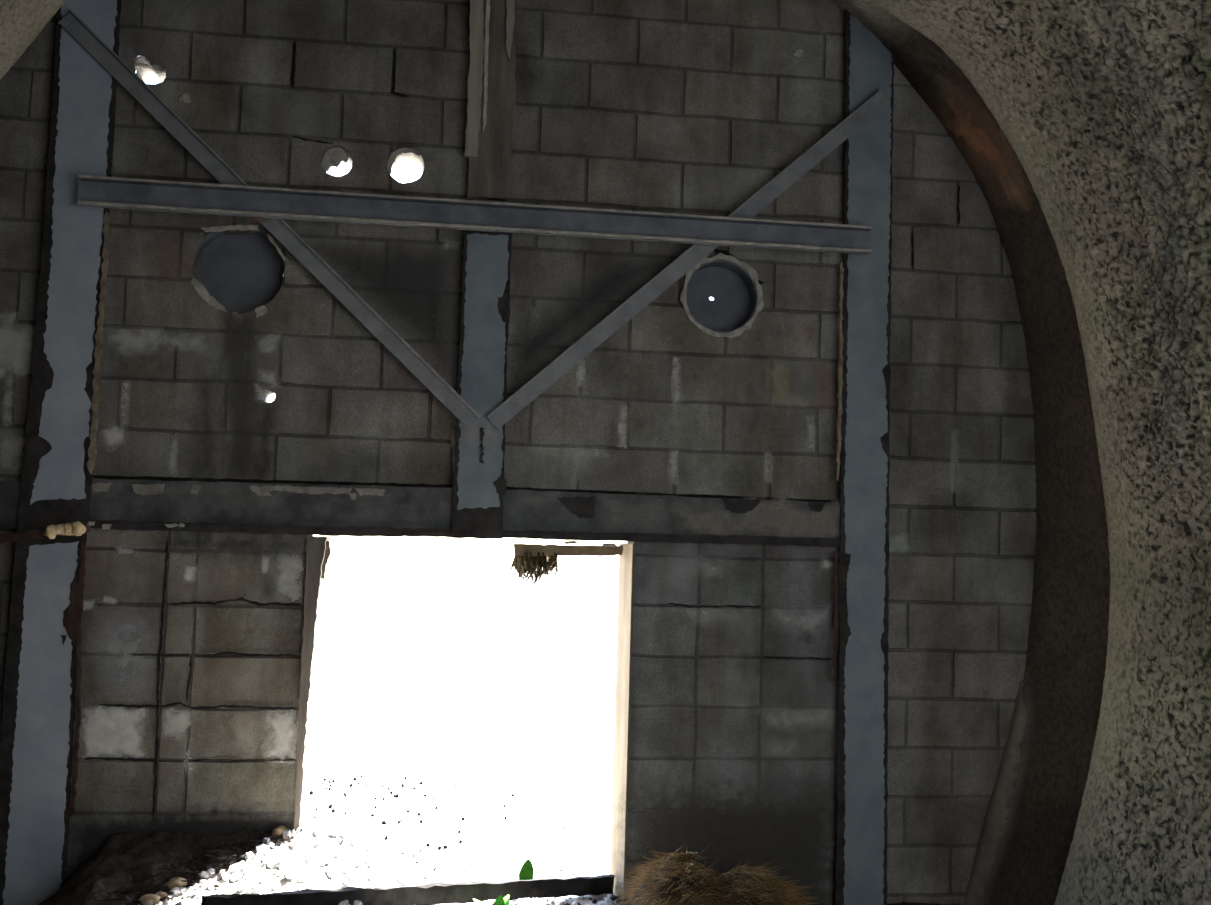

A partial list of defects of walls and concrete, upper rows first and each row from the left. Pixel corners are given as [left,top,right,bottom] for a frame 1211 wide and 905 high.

corrosion [943,90,1023,201]
peeling [23,359,54,504]
peeling [479,427,502,464]
peeling [680,498,836,537]
peeling [61,584,82,645]
water stain [83,707,144,757]
water stain [165,711,189,735]
water stain [271,712,297,757]